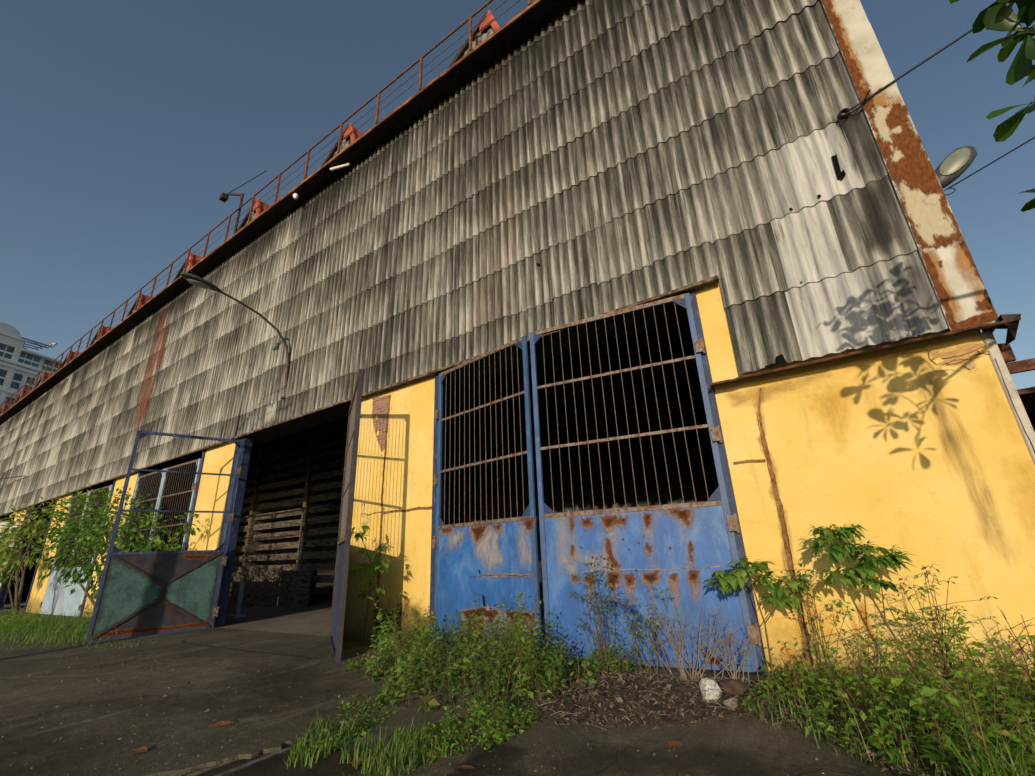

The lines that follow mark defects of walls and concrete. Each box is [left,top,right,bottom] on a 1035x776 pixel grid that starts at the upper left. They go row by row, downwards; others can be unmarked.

peeling [872,106,904,162]
peeling [899,180,956,246]
corrosion [470,524,502,544]
corrosion [551,513,722,606]
corrosion [666,509,693,525]